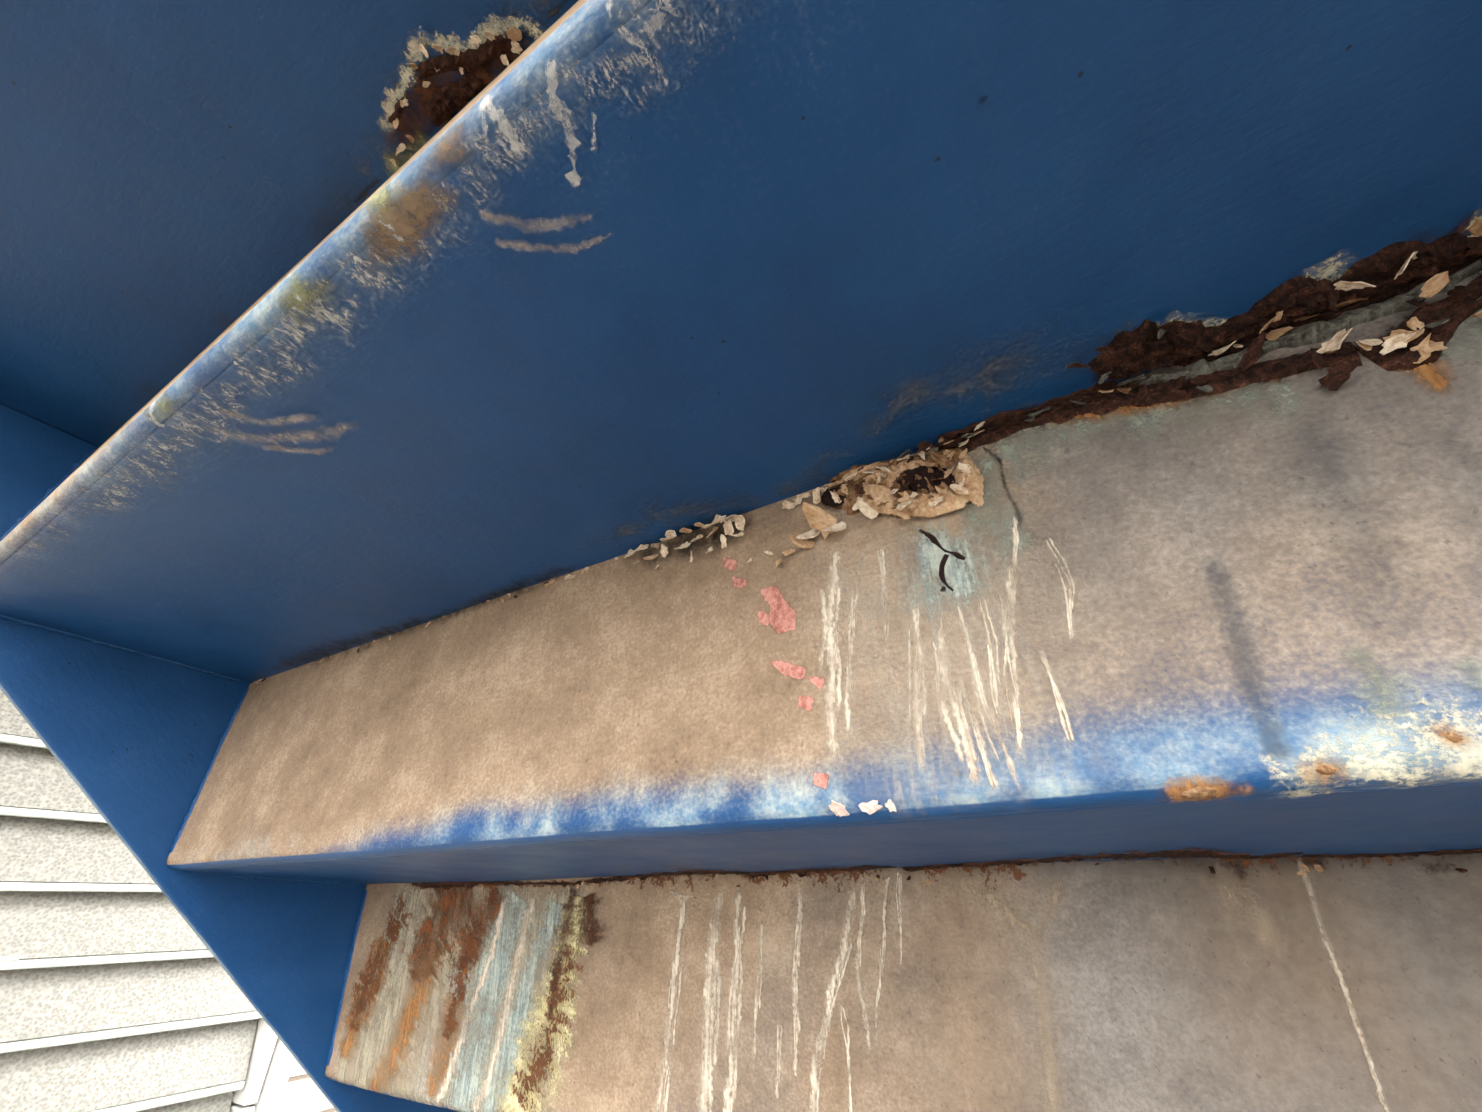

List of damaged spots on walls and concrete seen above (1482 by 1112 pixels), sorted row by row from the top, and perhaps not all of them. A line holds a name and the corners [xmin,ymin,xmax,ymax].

rust [354,0,566,203]
peeling [614,439,973,634]
peeling [253,567,590,684]
peeling [771,660,825,711]
rust [1166,777,1251,801]
rust [1268,650,1482,797]
rust [336,847,1482,1112]